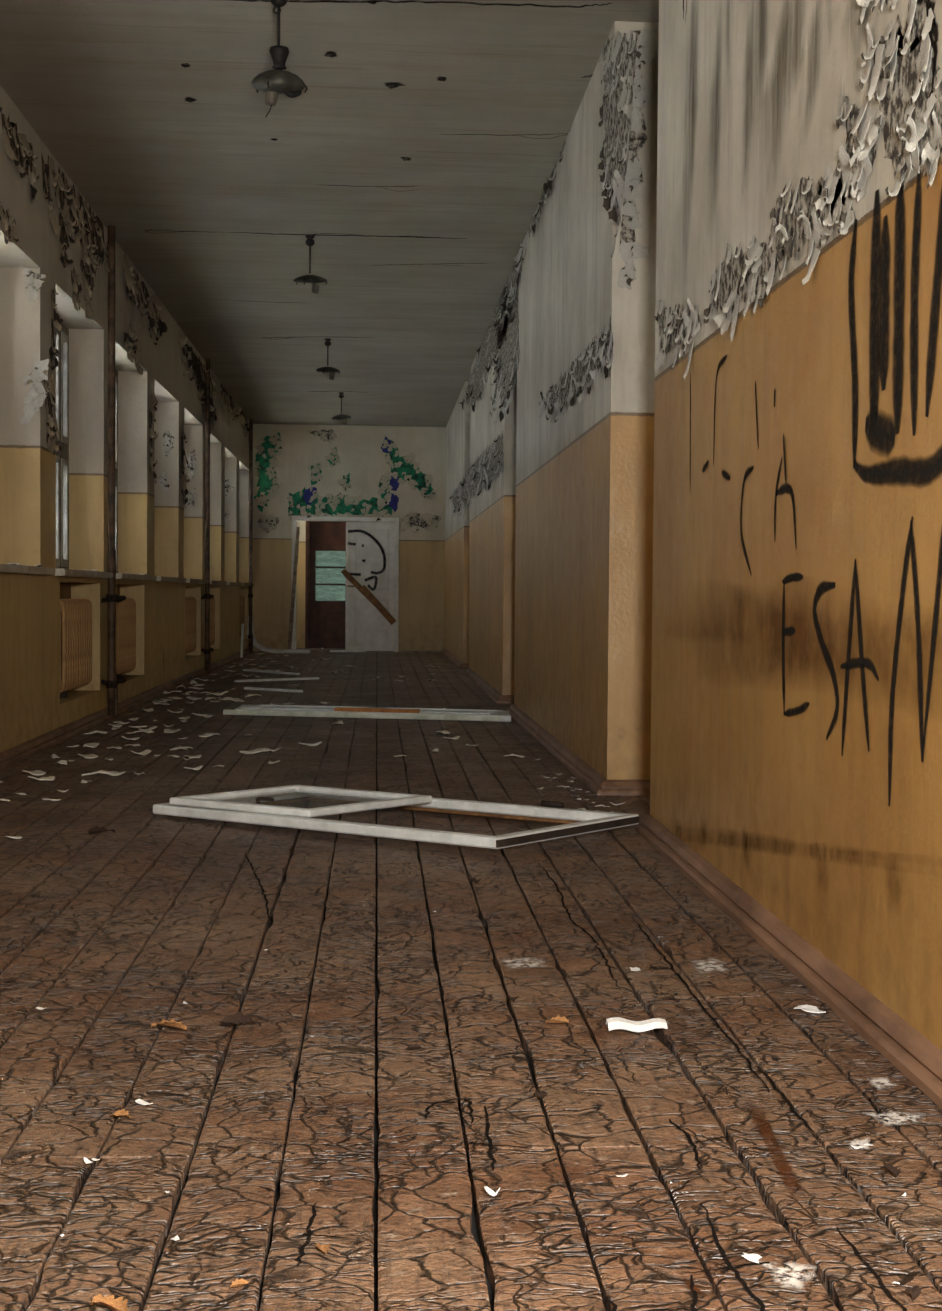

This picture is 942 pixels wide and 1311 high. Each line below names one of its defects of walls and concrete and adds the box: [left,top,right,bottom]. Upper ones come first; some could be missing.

crack [232,0,612,8]
peeling [598,29,659,290]
peeling [654,0,942,380]
peeling [0,107,217,509]
peeling [254,125,572,533]
peeling [539,316,614,423]
crack [538,863,619,987]
crack [632,917,823,1133]
crack [399,1098,527,1171]
crack [669,1119,730,1169]
crack [648,1203,770,1311]
crack [836,1227,925,1311]